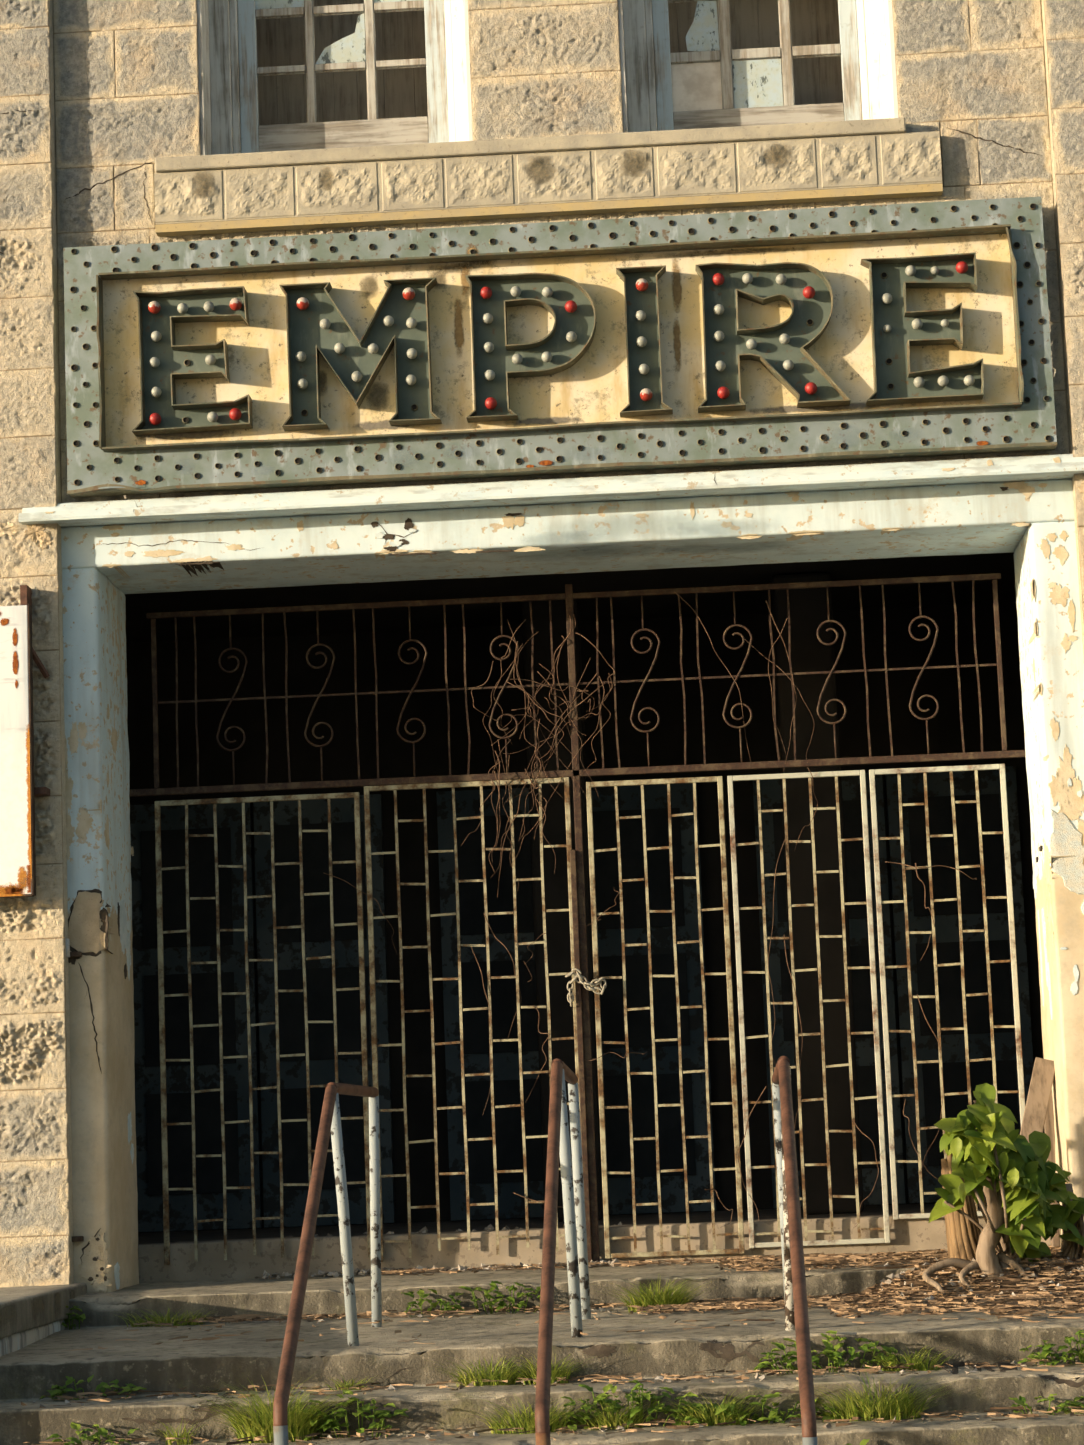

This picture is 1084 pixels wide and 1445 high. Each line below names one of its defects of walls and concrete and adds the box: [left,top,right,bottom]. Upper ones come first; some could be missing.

crack [952,129,1043,156]
peeling [786,530,825,541]
peeling [1040,531,1069,565]
corrosion [0,612,18,688]
peeling [1028,619,1043,701]
peeling [1030,578,1078,653]
corrosion [0,725,32,897]
spalling [68,889,131,980]
crack [79,964,102,1074]